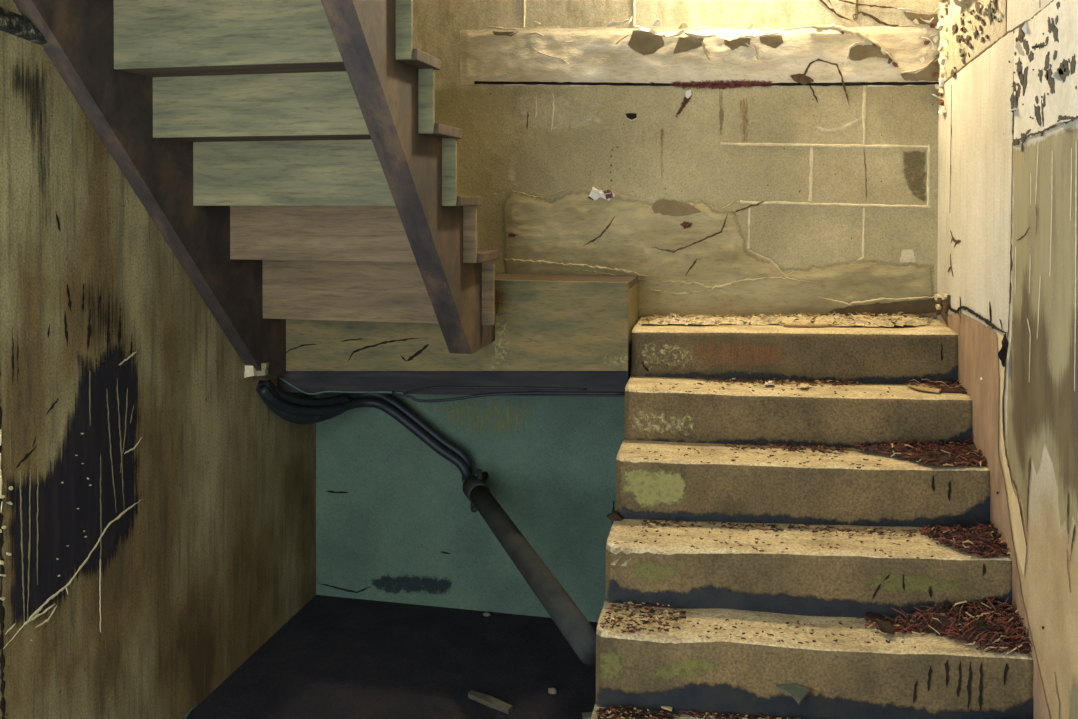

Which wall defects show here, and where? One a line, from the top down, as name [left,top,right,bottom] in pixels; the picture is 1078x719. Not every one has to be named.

peeling [489,21,569,64]
crack [474,81,675,131]
crack [748,225,793,277]
peeling [607,0,1078,152]
crack [770,58,952,192]
crack [861,152,869,201]
crack [948,143,1030,338]
crack [342,338,429,361]
damp [1007,130,1078,561]
damp [6,284,141,641]
crack [0,372,13,719]